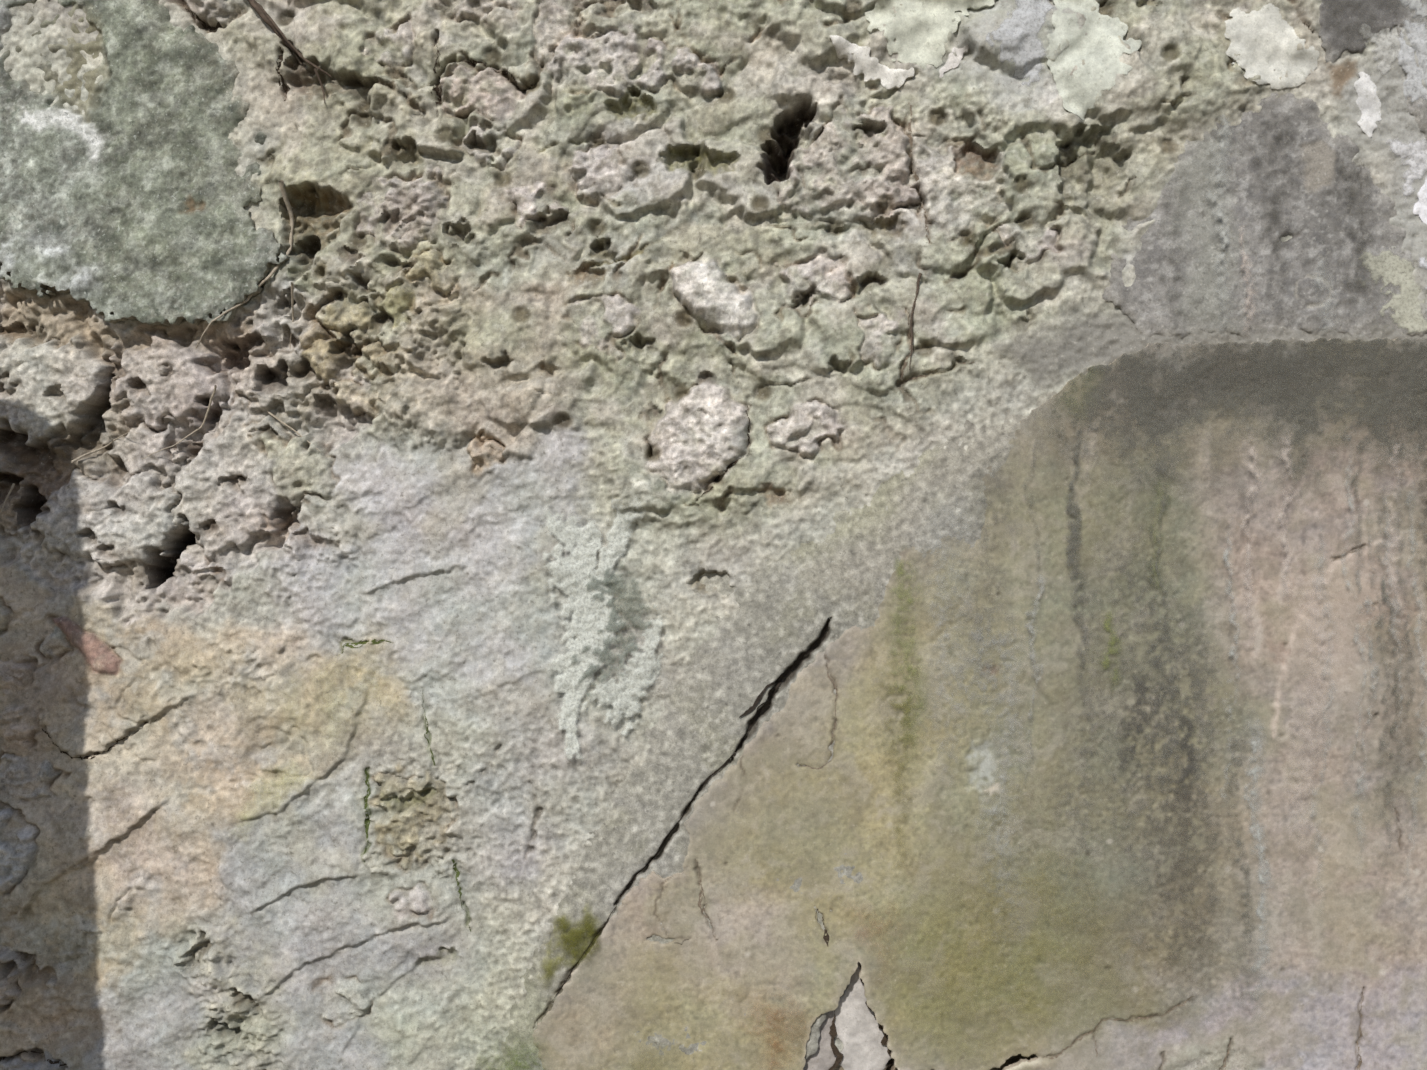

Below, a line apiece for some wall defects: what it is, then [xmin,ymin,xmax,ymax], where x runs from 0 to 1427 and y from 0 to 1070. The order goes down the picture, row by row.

flaking render [0,0,477,618]
spalling [524,205,571,239]
spalling [585,230,774,507]
spalling [824,356,855,376]
spalling [744,0,1027,295]
leakage [1051,299,1427,496]
crack [552,618,837,1001]
leakage [1103,499,1217,941]
leakage [1229,737,1269,970]
flaking render [532,903,898,1070]
spalling [990,1054,1029,1070]
crack [1047,996,1194,1059]